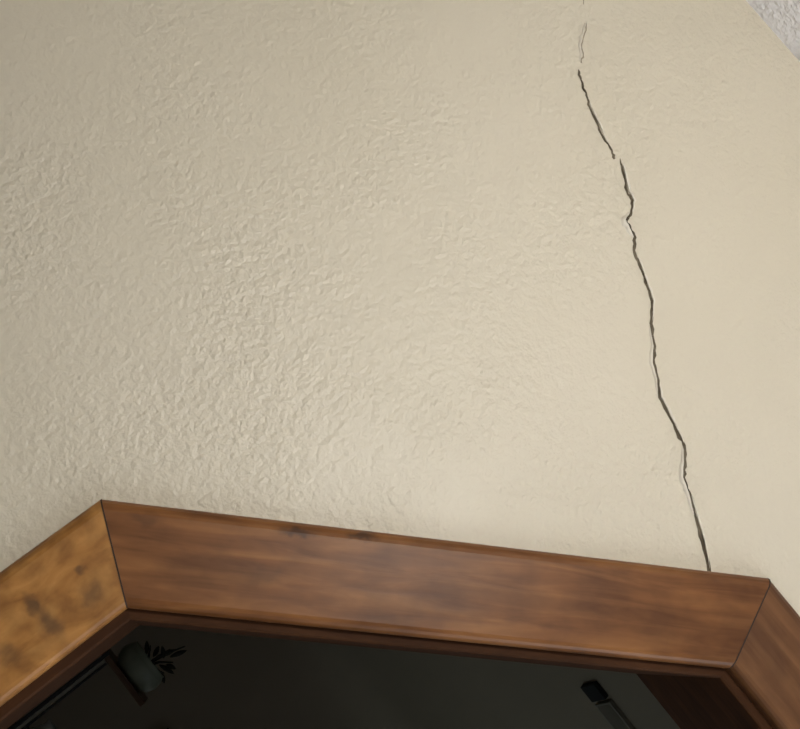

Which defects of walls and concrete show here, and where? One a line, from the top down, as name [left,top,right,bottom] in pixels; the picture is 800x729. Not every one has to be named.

crack [578,0,711,571]